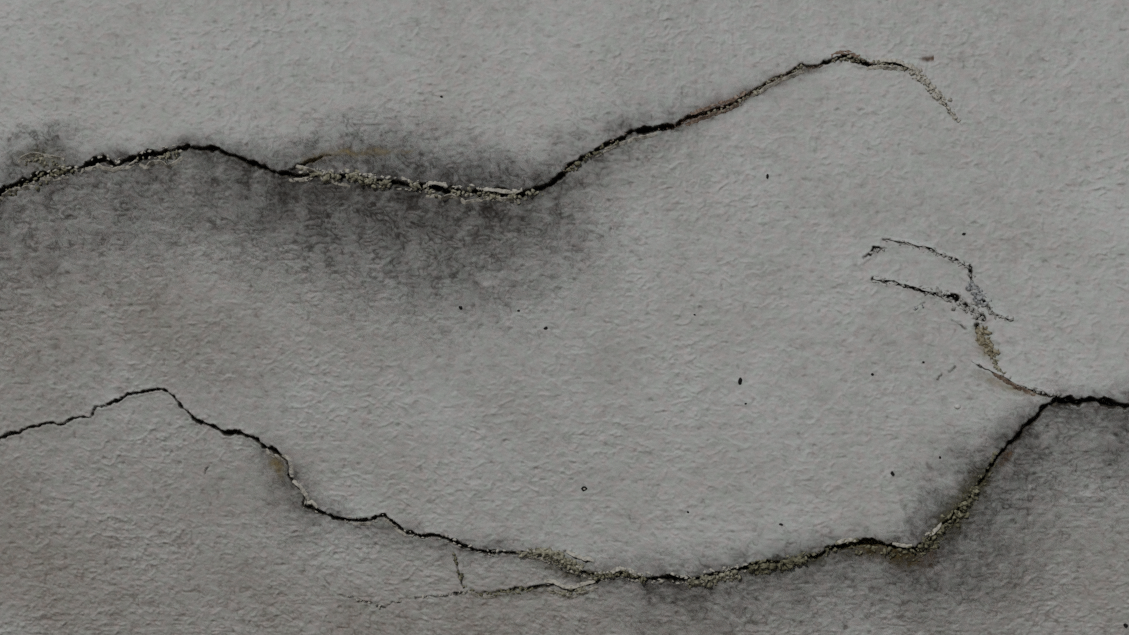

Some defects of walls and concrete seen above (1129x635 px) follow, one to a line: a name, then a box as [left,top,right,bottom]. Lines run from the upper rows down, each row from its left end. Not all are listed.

crack [0,50,961,204]
crack [0,235,1129,609]